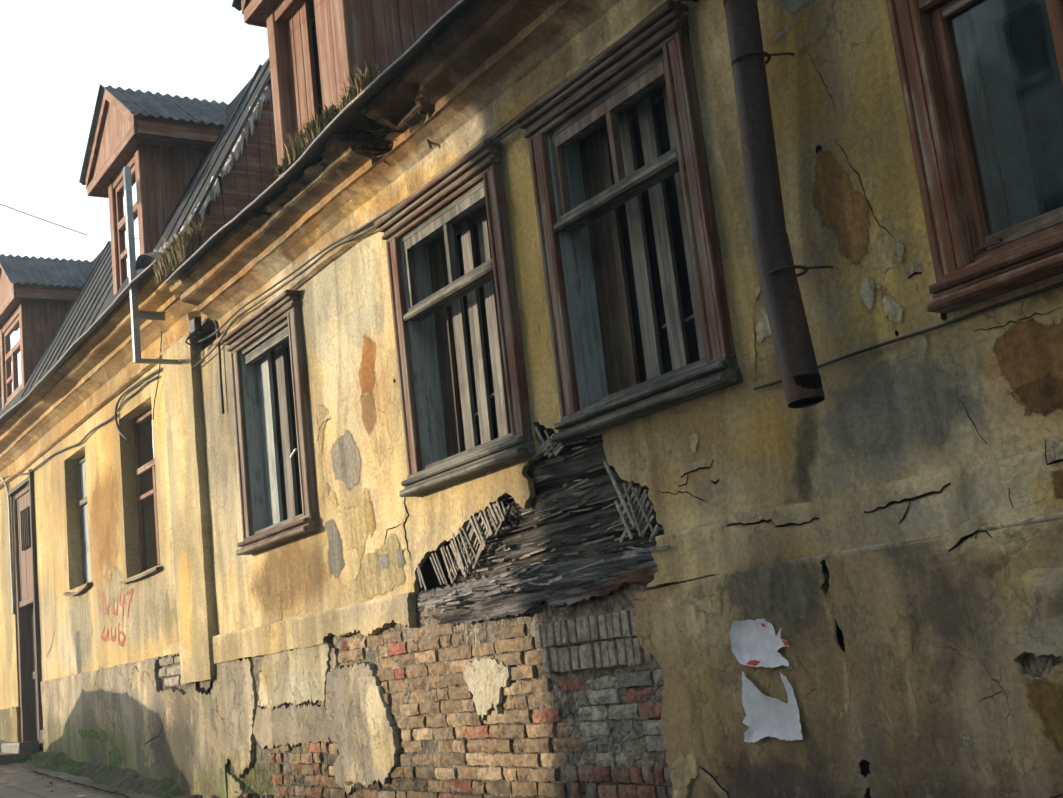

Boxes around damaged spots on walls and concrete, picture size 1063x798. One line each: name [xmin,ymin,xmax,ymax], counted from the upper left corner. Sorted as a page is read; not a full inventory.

peeling [812,149,871,266]
crack [835,139,895,238]
peeling [860,276,903,323]
crack [885,261,923,280]
peeling [992,316,1063,417]
crack [1044,428,1063,465]
peeling [317,405,405,600]
crack [864,476,951,525]
crack [945,518,992,552]
water stain [731,555,819,633]
spalling [269,608,673,798]
spalling [1019,652,1063,678]